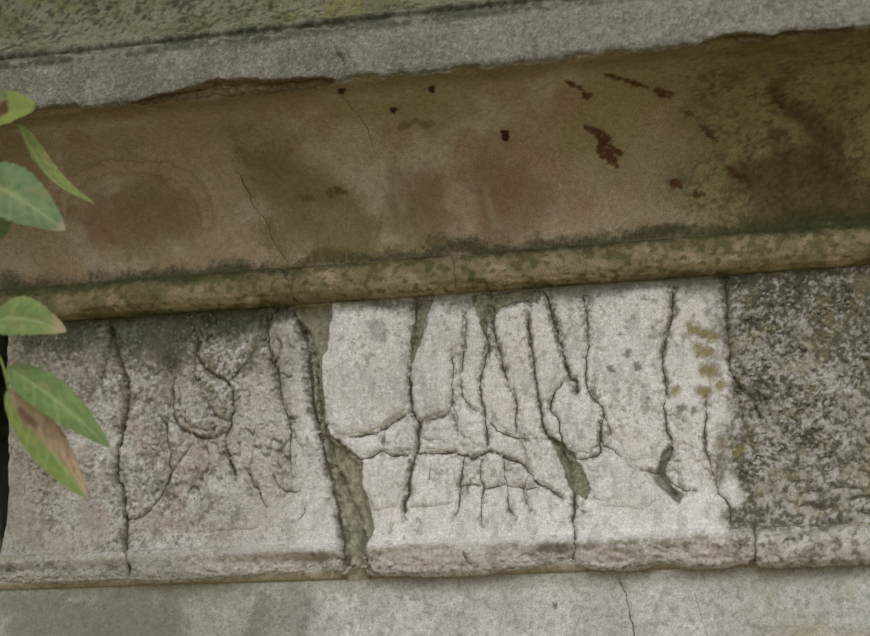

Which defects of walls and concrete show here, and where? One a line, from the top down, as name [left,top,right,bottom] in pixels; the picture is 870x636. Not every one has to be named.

spalling [127,76,334,106]
corrosion [565,81,592,100]
corrosion [605,74,673,98]
corrosion [584,125,624,168]
crack [100,170,622,572]
crack [640,291,692,491]
crack [704,278,761,528]
spalling [295,299,463,581]
crack [796,486,870,525]
spalling [185,551,333,576]